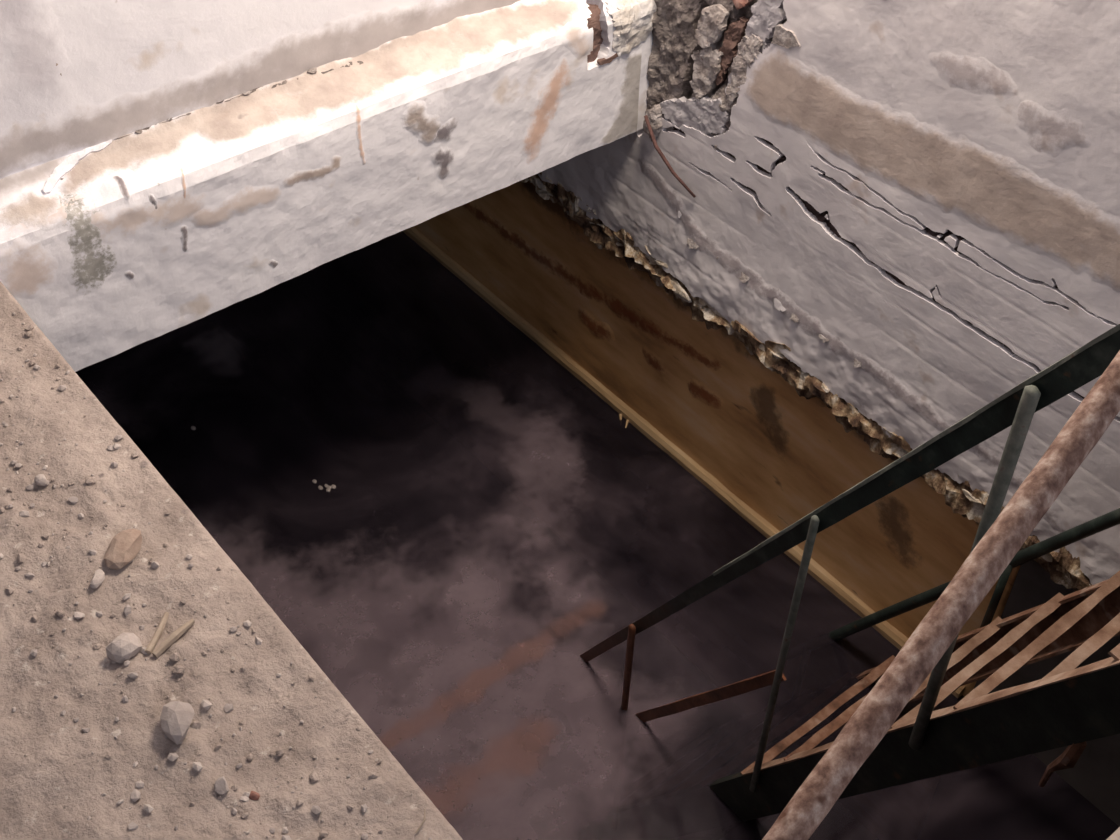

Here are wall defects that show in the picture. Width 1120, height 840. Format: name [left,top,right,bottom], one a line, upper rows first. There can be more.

damp [0,0,521,179]
rust [519,21,593,165]
flaking render [0,0,1120,293]
damp [928,50,1092,158]
damp [0,182,282,299]
spalling [520,155,952,461]
crack [708,138,1039,368]
spalling [920,469,989,524]
peeling [969,442,1000,468]
peeling [1010,470,1025,489]
spalling [1019,535,1093,592]